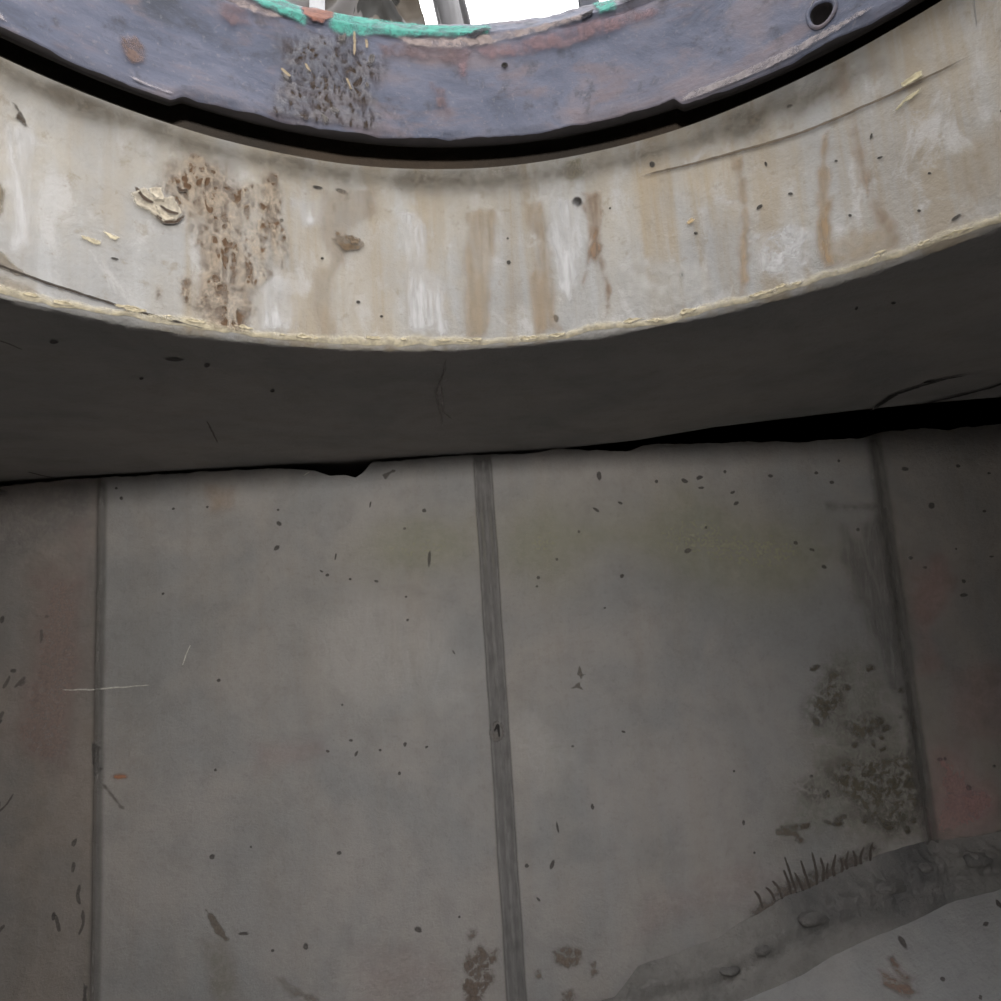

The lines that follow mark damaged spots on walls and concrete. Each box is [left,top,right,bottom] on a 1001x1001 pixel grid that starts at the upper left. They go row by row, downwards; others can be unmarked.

crack [645,61,959,175]
damp [0,252,35,294]
spalling [0,154,1001,347]
rust [583,193,603,265]
rust [818,167,834,265]
damp [810,665,851,726]
damp [805,708,929,834]
peeling [463,931,497,1001]